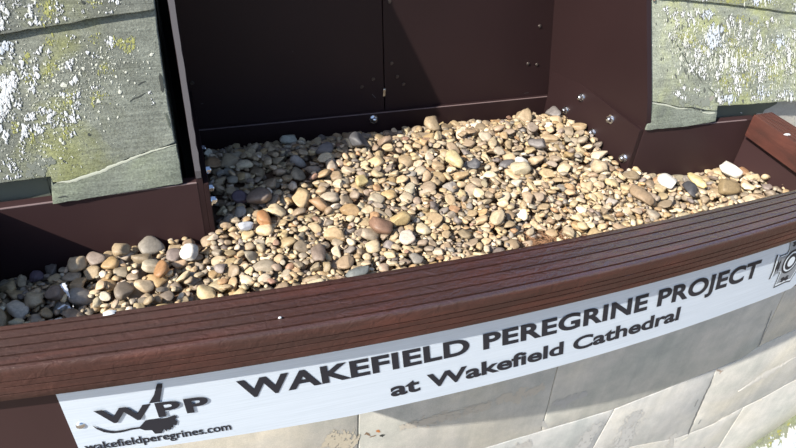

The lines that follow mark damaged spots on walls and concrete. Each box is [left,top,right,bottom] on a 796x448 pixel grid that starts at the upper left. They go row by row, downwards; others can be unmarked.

leakage [0,154,56,202]
crack [688,369,723,434]